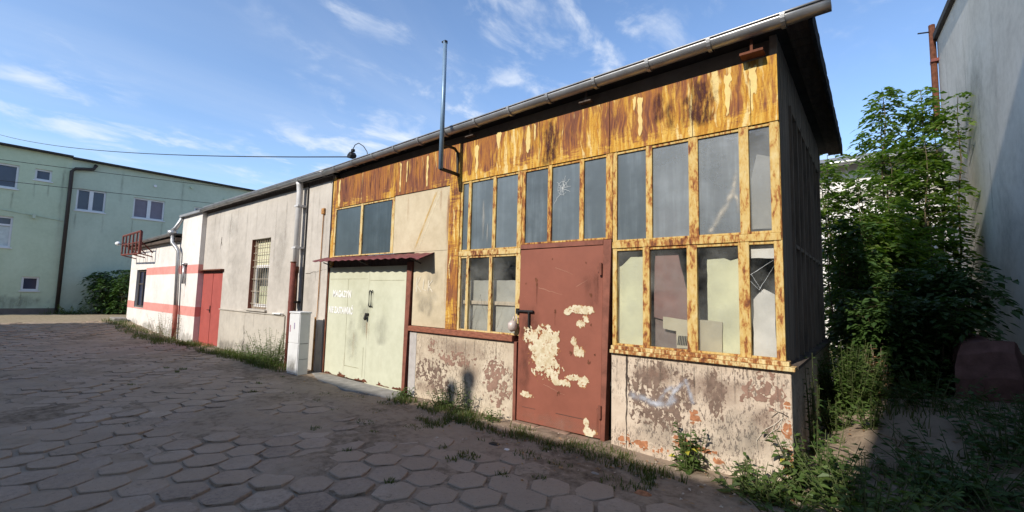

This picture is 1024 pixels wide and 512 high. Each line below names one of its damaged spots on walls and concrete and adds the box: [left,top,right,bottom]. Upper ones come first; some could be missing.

rust [685,83,714,124]
rust [543,122,556,161]
peeling [416,338,534,411]
peeling [523,304,595,389]
peeling [583,417,598,437]
peeling [618,359,732,467]
peeling [739,370,794,477]